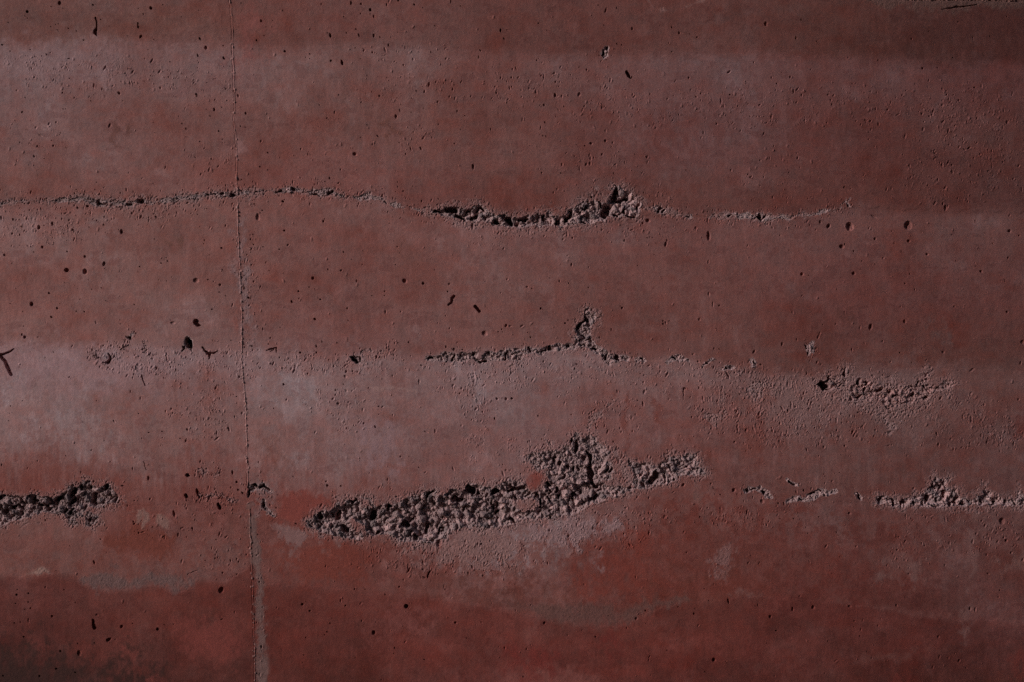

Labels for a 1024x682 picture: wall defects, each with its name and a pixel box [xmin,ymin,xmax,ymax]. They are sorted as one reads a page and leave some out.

spalling [430,185,643,229]
spalling [813,367,955,420]
spalling [0,479,119,527]
spalling [249,397,707,578]
spalling [873,476,1024,509]